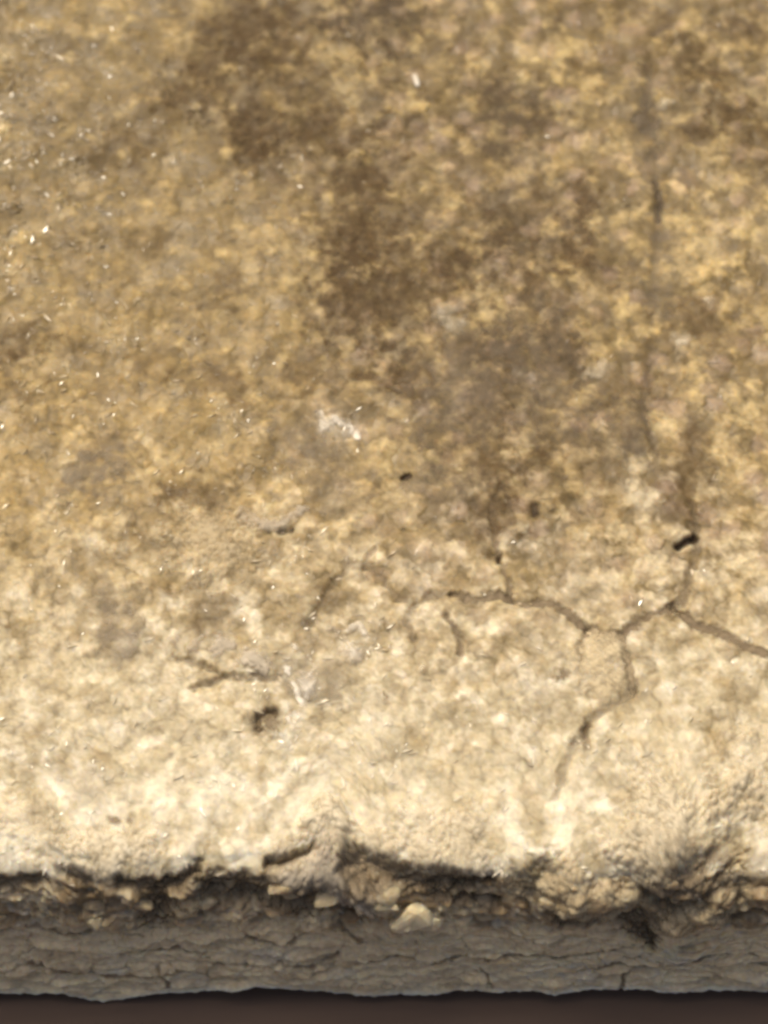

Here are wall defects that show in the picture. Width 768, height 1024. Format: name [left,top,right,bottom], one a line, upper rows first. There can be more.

leakage [564,171,598,268]
crack [444,502,768,695]
spalling [0,829,768,1002]